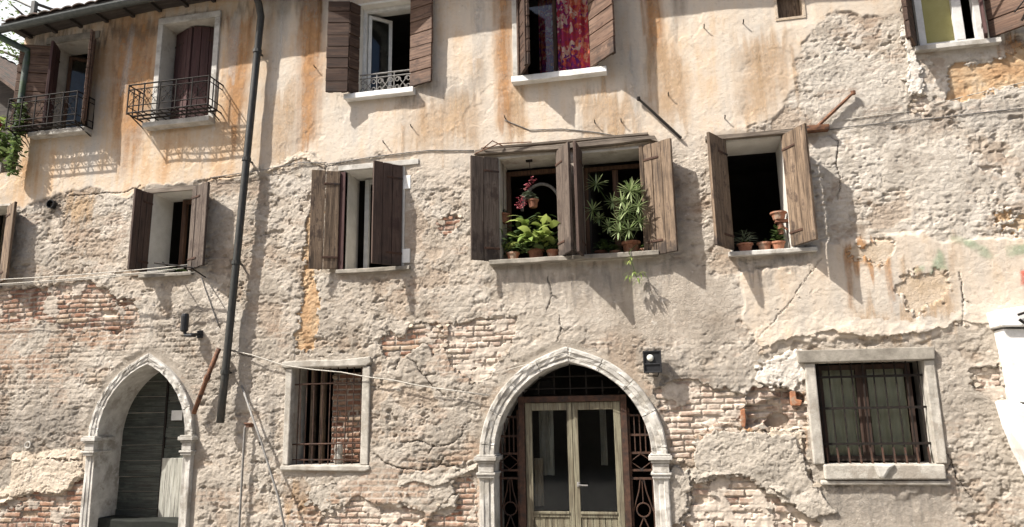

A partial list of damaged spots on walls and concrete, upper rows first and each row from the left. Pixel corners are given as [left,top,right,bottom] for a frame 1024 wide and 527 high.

spalling [907,87,931,117]
peeling [945,46,1024,102]
spalling [0,280,140,338]
peeling [293,214,321,353]
rust [845,238,890,279]
spalling [379,316,518,386]
spalling [654,379,822,527]
spalling [0,478,84,527]